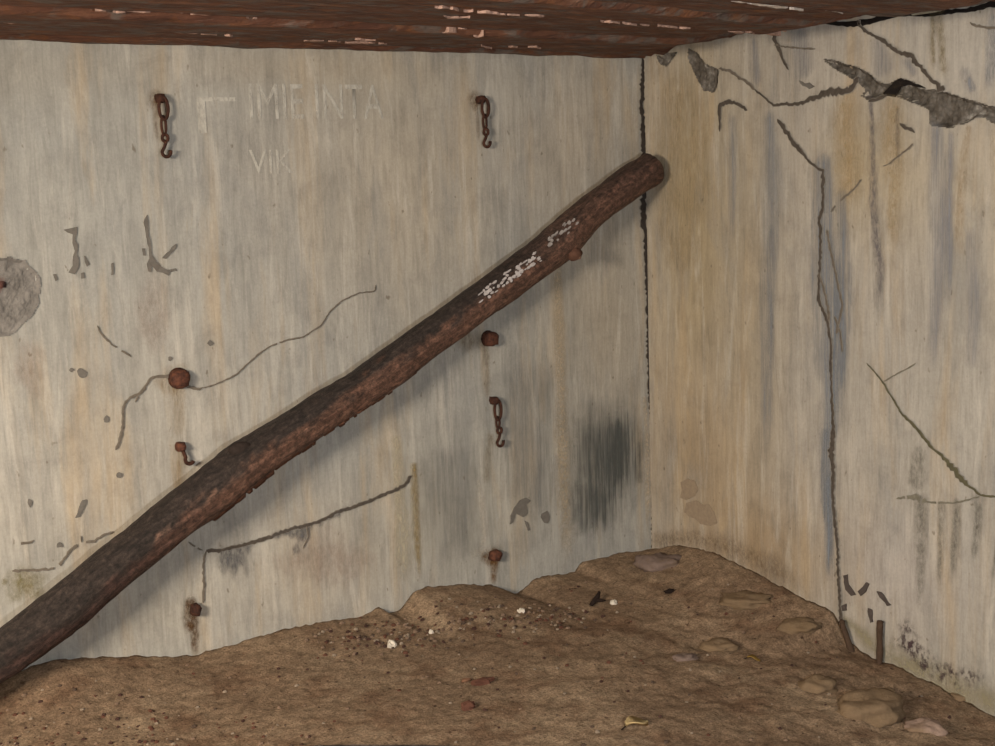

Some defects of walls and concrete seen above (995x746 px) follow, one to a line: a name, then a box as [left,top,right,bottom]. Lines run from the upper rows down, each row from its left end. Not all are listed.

spalling [656,48,718,93]
crack [772,36,815,70]
crack [857,20,945,93]
spalling [824,58,995,128]
crack [883,123,915,167]
spalling [53,227,90,281]
spalling [0,256,41,337]
crack [115,285,376,450]
crack [717,67,887,620]
crack [867,363,995,504]
crack [189,475,412,603]
corrosion [185,600,199,646]